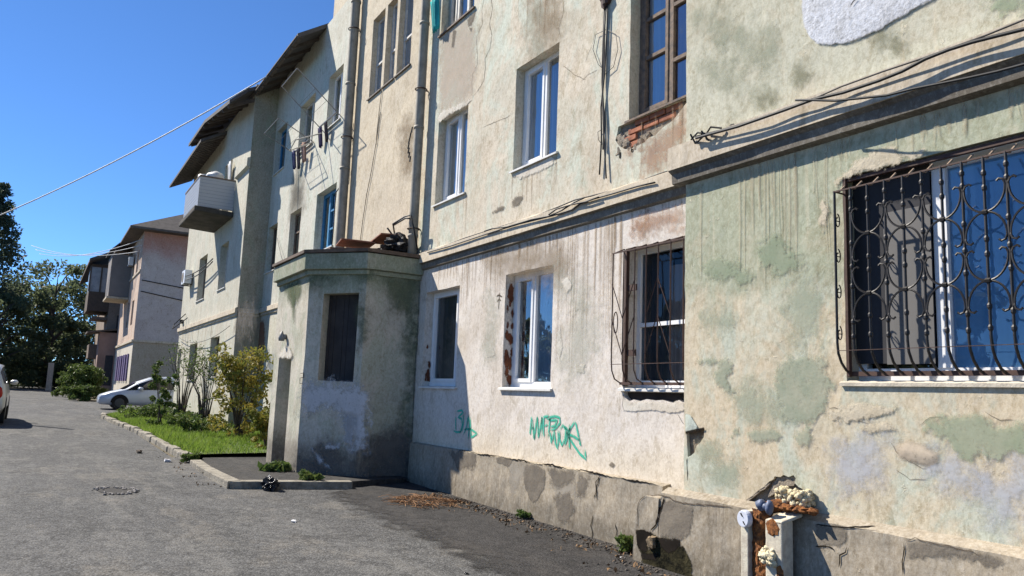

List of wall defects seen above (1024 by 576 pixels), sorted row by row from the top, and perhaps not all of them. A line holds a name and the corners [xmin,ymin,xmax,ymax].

spalling [615,100,687,171]
spalling [622,392,705,475]
spalling [636,500,693,576]